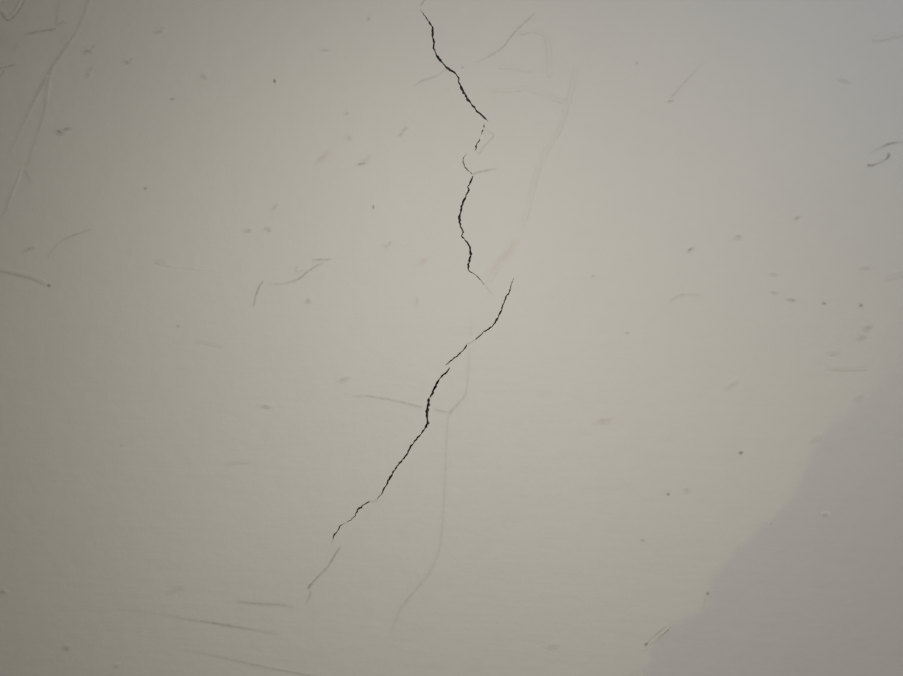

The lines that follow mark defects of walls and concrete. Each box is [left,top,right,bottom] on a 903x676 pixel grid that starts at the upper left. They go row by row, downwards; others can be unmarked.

crack [236,0,513,608]